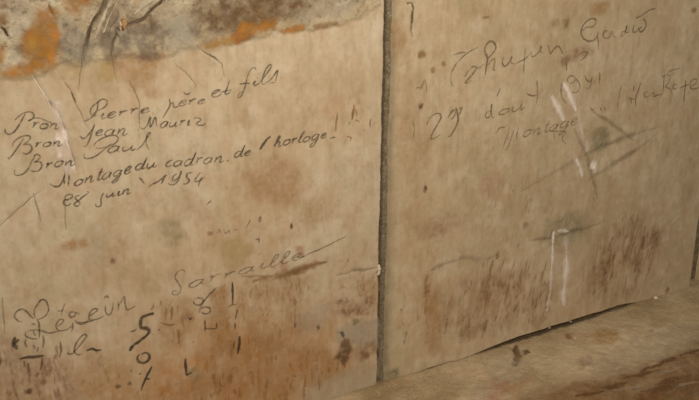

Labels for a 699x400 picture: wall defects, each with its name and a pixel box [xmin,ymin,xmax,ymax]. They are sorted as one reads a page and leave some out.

rust [11,9,59,75]
spalling [0,0,381,158]